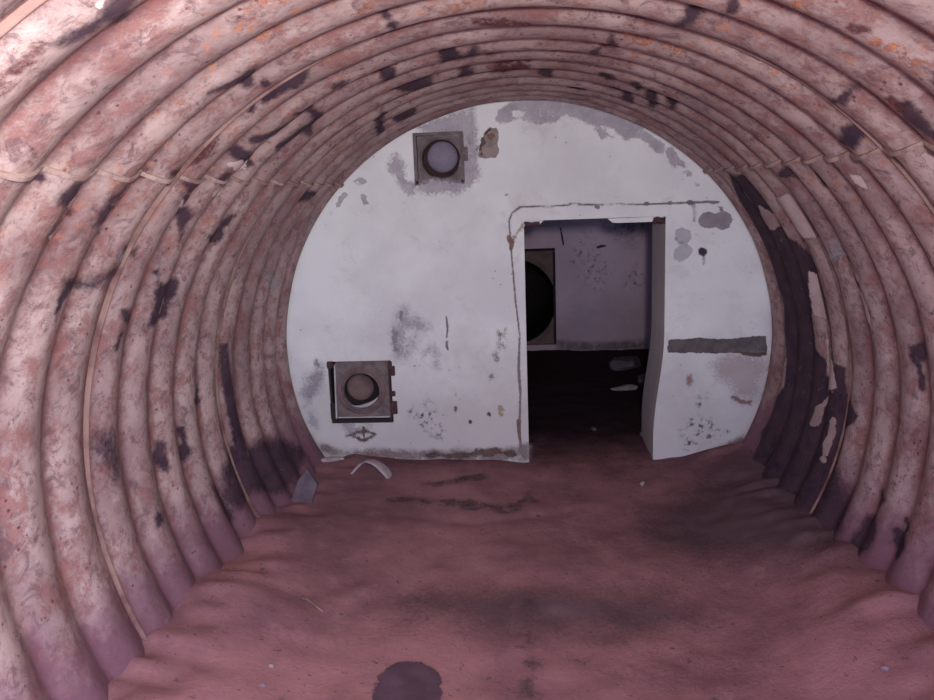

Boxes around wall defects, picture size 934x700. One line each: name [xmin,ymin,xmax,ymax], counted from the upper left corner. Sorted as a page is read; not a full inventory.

corrosion [473,18,532,27]
peeling [726,0,739,13]
corrosion [490,59,530,73]
peeling [207,68,309,113]
flaking render [388,100,691,195]
flaking render [698,207,732,230]
peeling [150,270,179,326]
peeling [728,172,858,493]